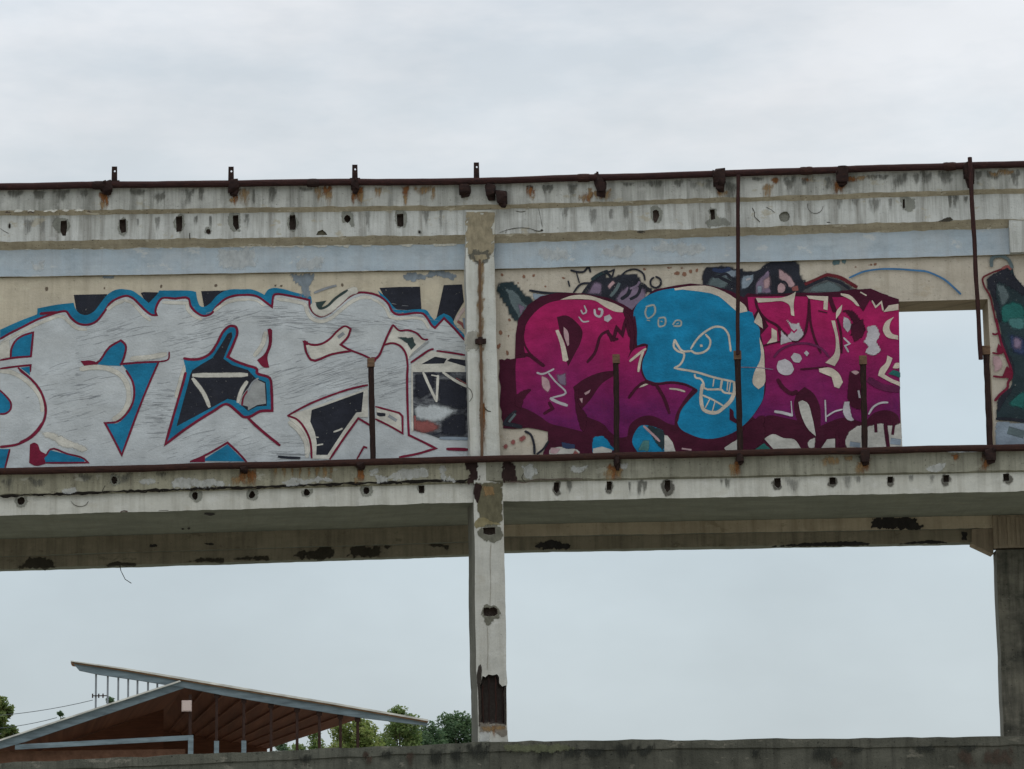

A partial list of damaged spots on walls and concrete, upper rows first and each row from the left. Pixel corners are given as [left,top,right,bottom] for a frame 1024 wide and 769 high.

corrosion [477,263,485,370]
spalling [473,482,503,543]
spalling [477,664,507,737]